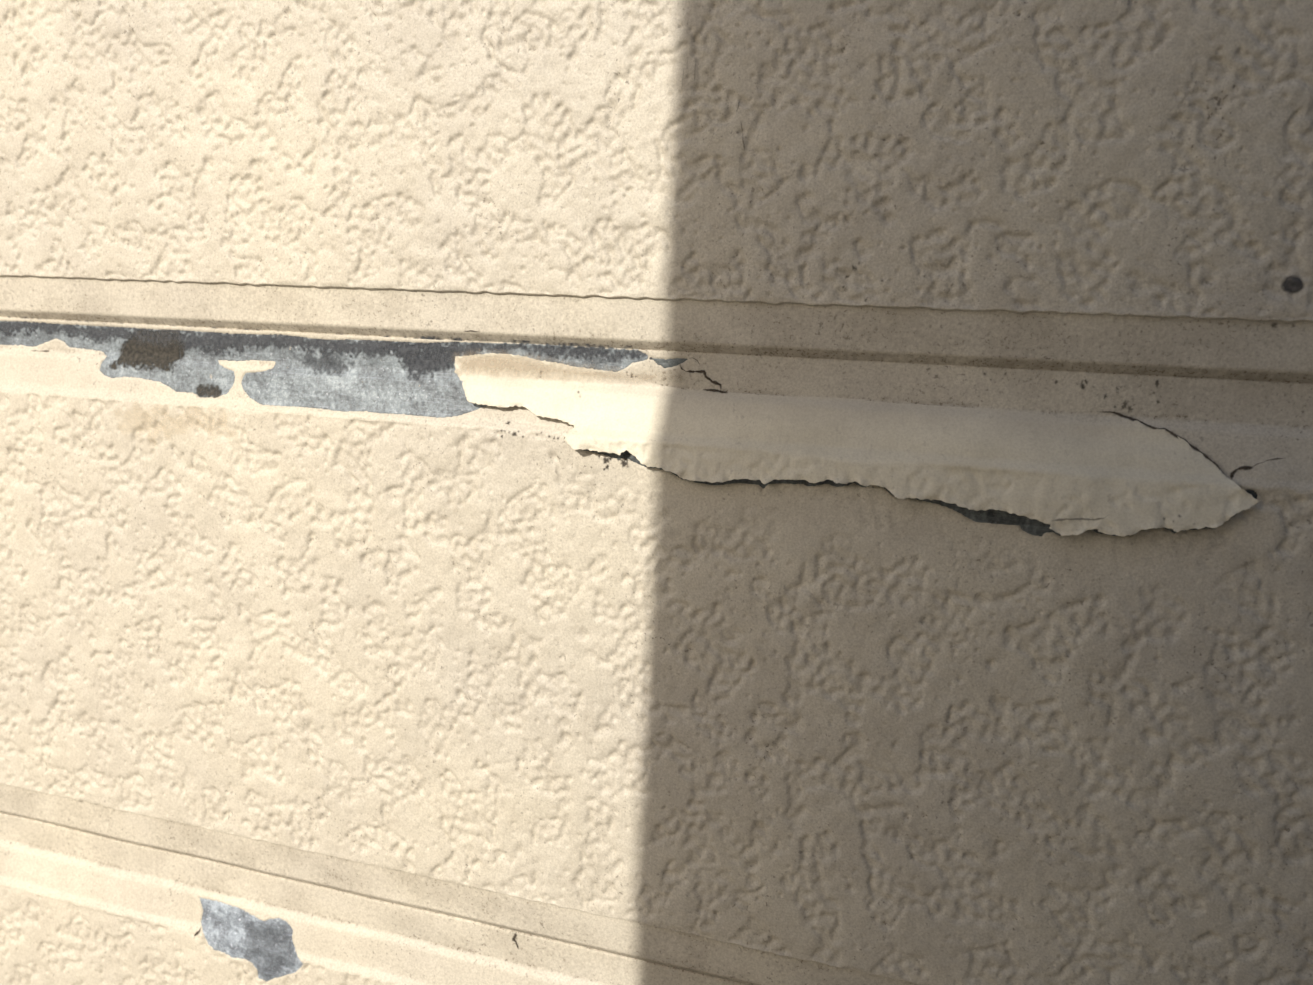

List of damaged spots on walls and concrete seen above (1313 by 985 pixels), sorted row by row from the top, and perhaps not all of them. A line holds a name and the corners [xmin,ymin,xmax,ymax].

peeling [0,317,1259,537]
peeling [194,898,303,982]